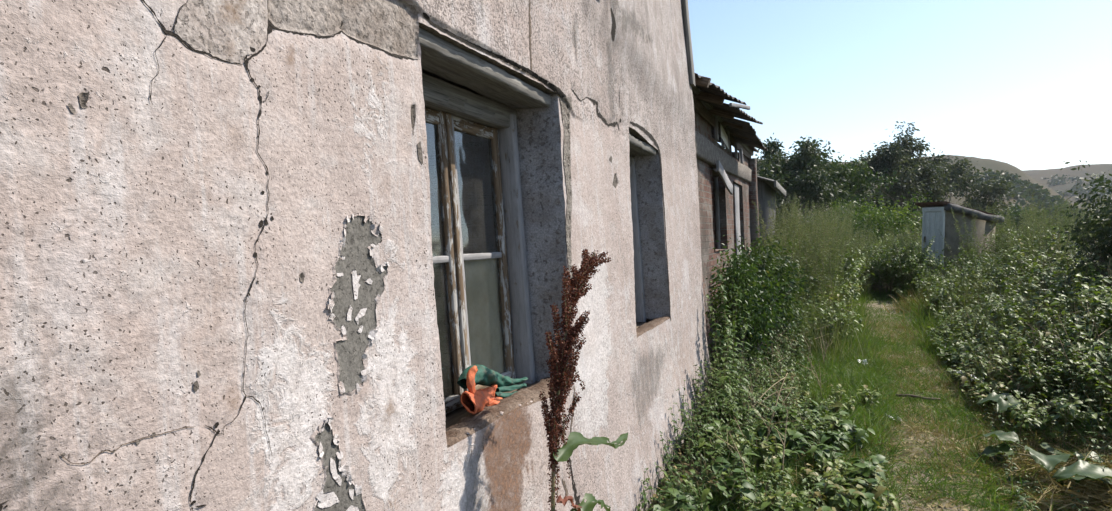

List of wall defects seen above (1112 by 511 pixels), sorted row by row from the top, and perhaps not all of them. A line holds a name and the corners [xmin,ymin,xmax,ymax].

flaking render [175,0,419,63]
crack [423,2,671,320]
crack [60,0,414,511]
peeling [325,214,389,396]
peeling [310,415,366,511]